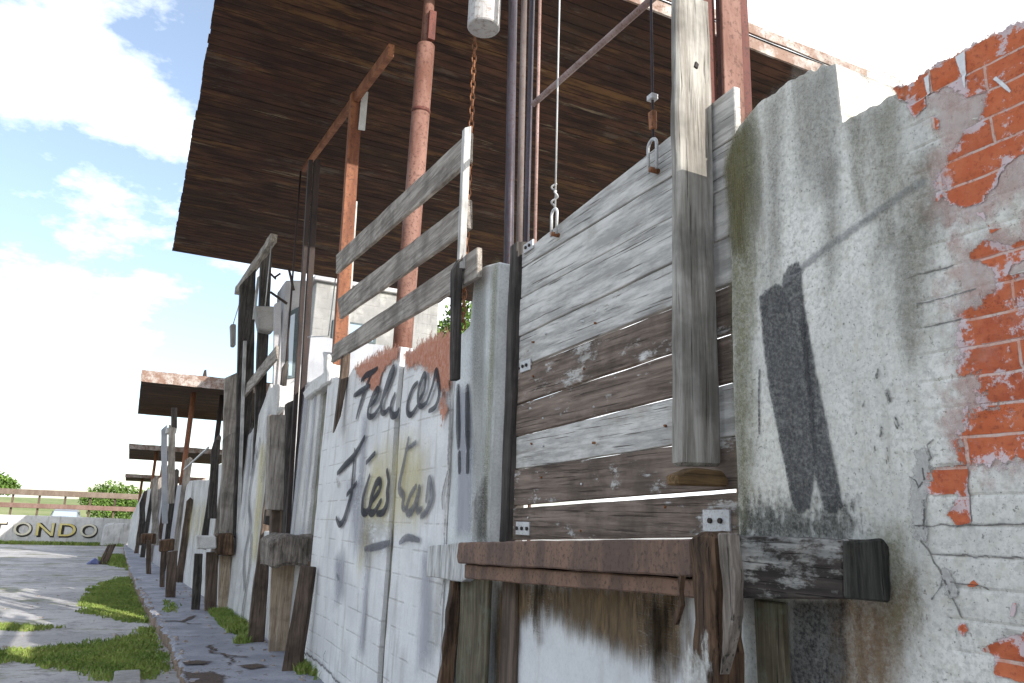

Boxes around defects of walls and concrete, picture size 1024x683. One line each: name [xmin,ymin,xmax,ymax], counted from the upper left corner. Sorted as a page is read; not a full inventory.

peeling [893,20,1024,545]
crack [909,439,1024,618]
damp [494,586,503,683]
damp [519,584,690,683]
peeling [982,632,1024,682]